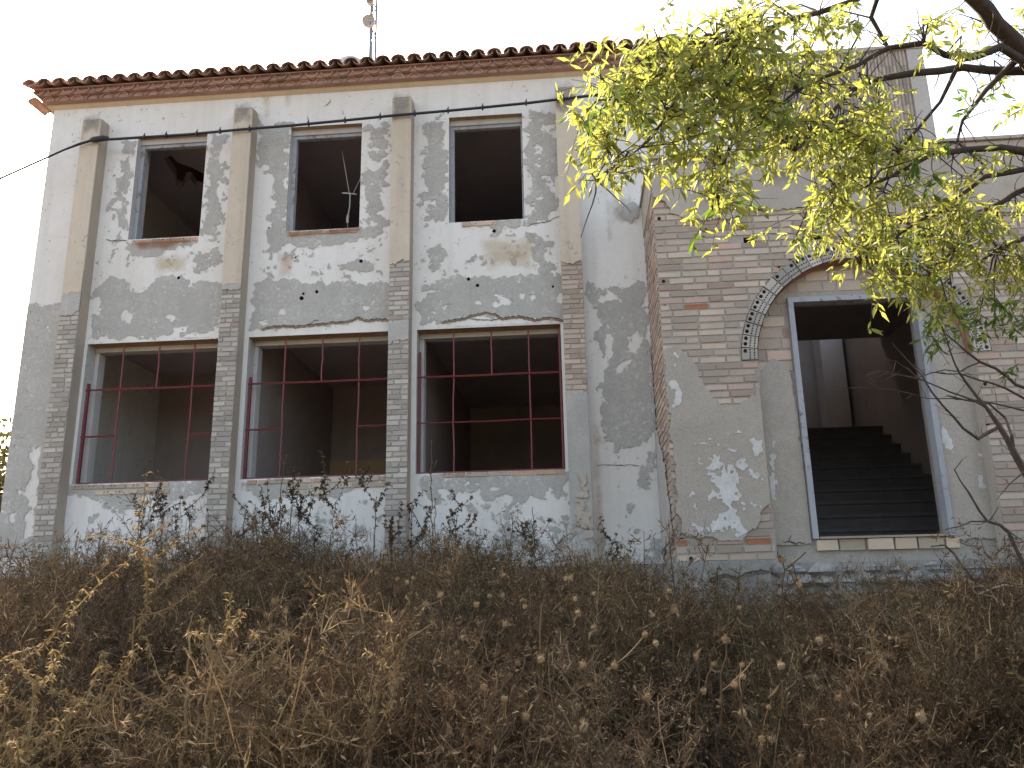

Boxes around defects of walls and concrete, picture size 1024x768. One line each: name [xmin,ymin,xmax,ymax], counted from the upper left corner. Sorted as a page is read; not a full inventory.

crack [261,316,389,331]
crack [441,311,563,324]
peeling [0,109,1024,574]